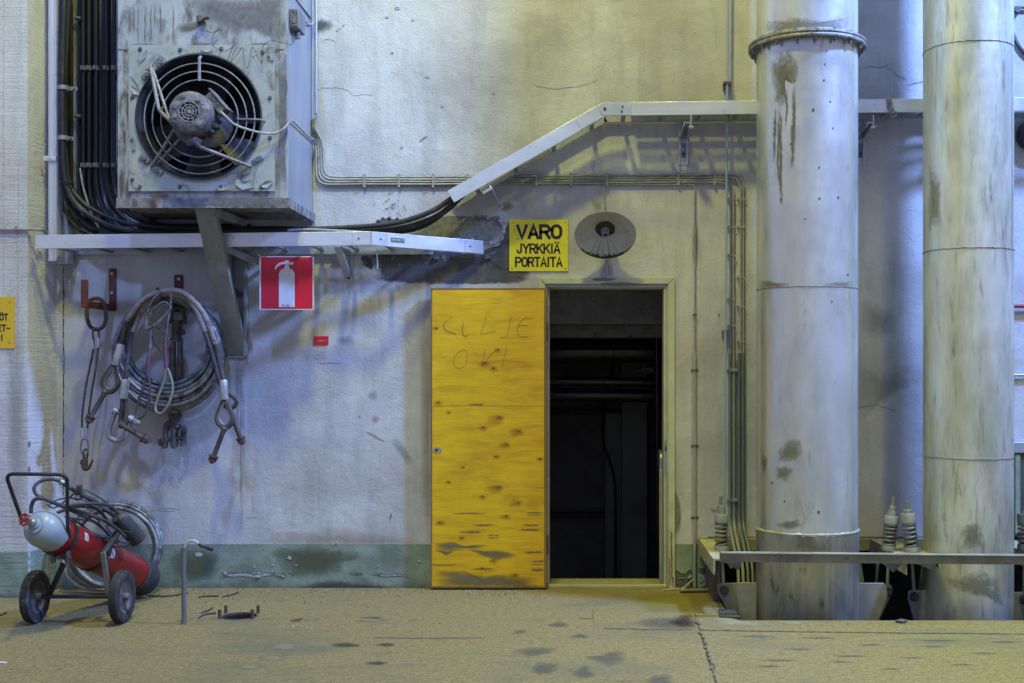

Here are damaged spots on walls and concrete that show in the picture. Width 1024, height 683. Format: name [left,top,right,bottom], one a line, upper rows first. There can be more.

spalling [376,215,507,245]